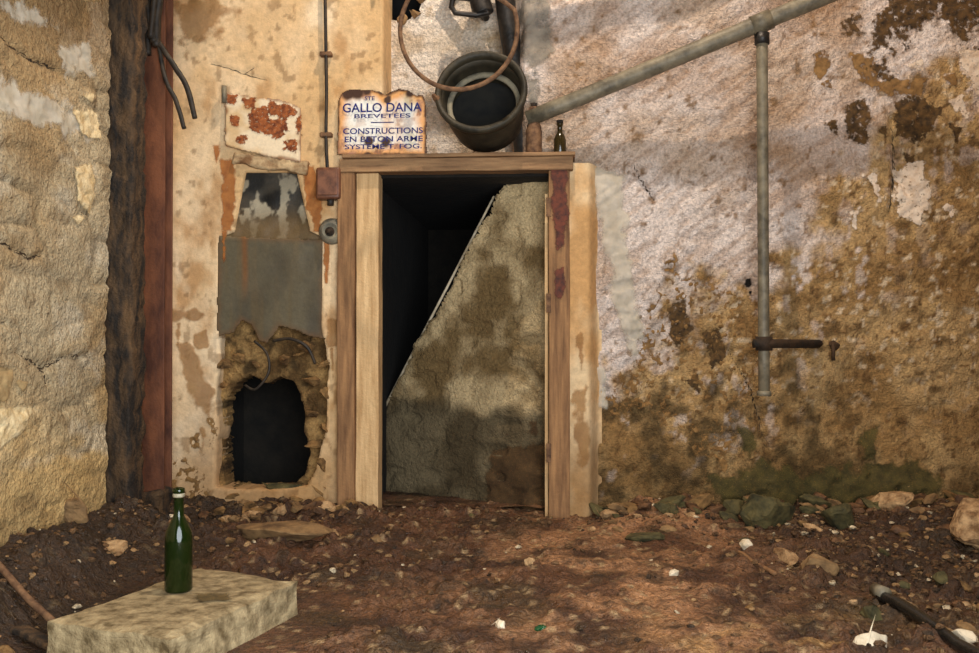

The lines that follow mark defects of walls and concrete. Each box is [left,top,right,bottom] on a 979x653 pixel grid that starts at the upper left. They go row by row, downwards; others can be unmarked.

damp [841,0,979,81]
peeling [825,49,979,225]
peeling [845,206,861,229]
spalling [190,321,330,502]
spalling [172,457,209,499]